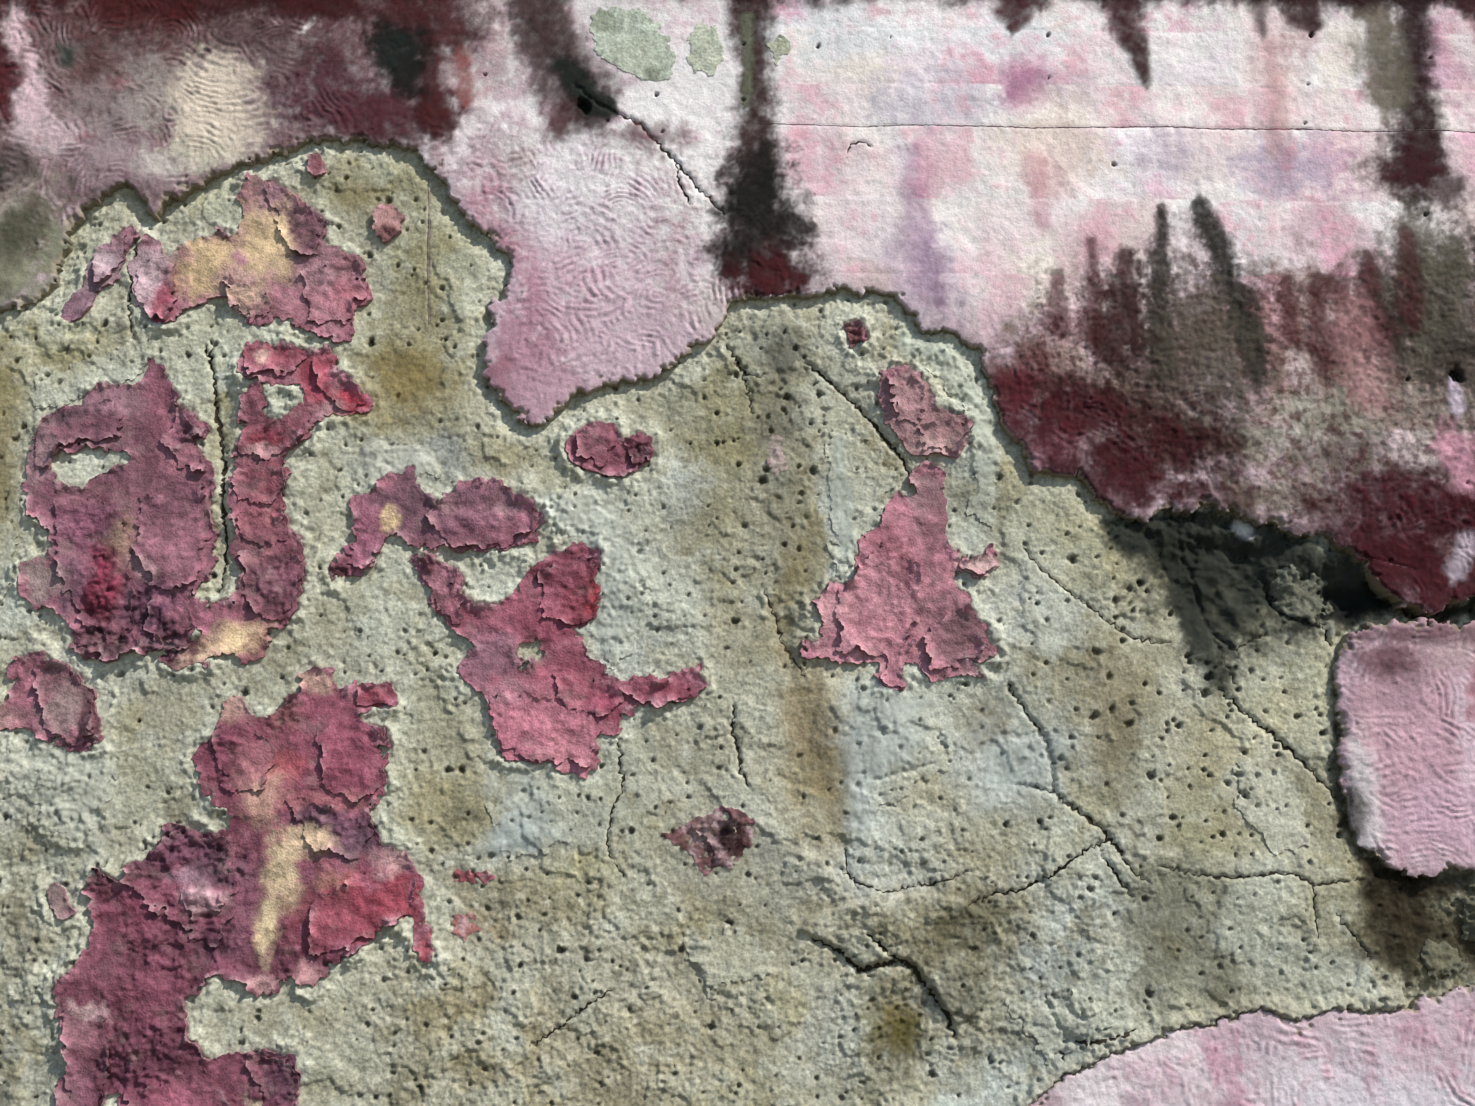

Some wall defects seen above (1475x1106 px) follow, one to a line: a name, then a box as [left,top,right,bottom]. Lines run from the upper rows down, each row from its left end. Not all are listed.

peeling [128,172,374,344]
leakage [510,0,619,134]
leakage [708,0,812,296]
leakage [1101,0,1159,87]
leakage [1081,196,1267,445]
leakage [1209,0,1475,415]
peeling [18,358,220,663]
peeling [159,339,374,671]
peeling [800,460,1000,691]
peeling [52,666,434,1106]
crack [812,934,956,1037]
crack [840,683,1372,957]